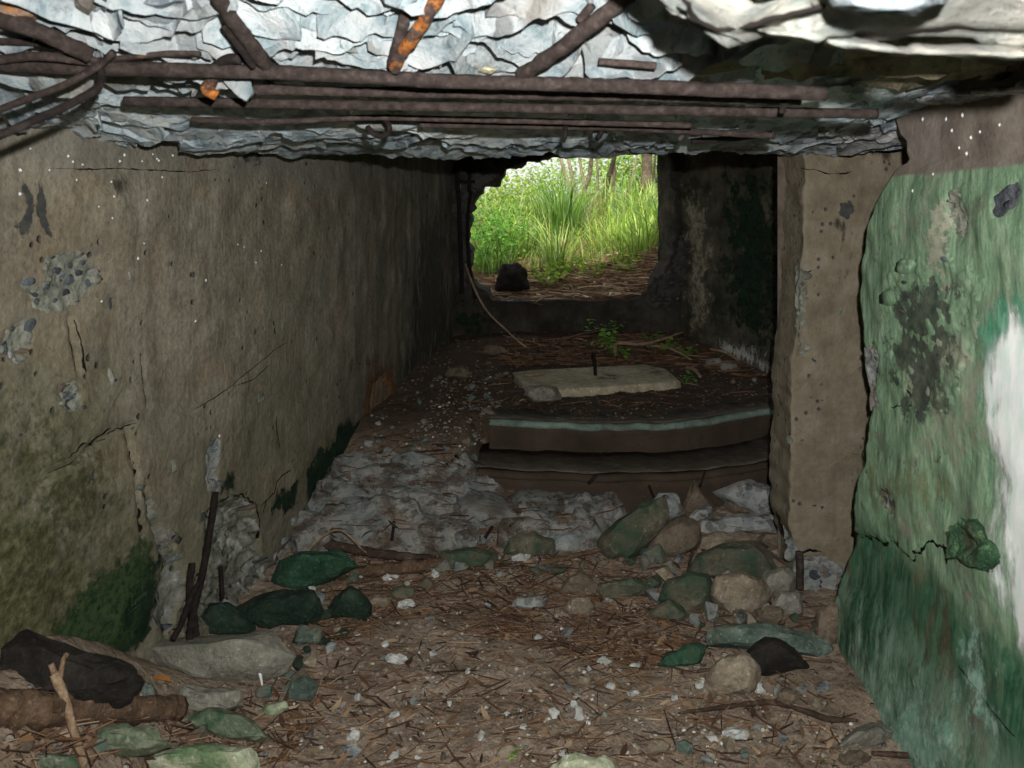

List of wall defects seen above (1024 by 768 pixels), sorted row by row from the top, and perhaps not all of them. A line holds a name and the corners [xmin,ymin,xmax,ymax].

crack [56,166,219,174]
corrosion [0,0,879,145]
spalling [0,0,1024,289]
spalling [0,251,103,365]
crack [48,353,146,539]
crack [195,342,288,409]
damp [883,200,965,424]
spalling [135,437,306,633]
crack [857,533,948,564]